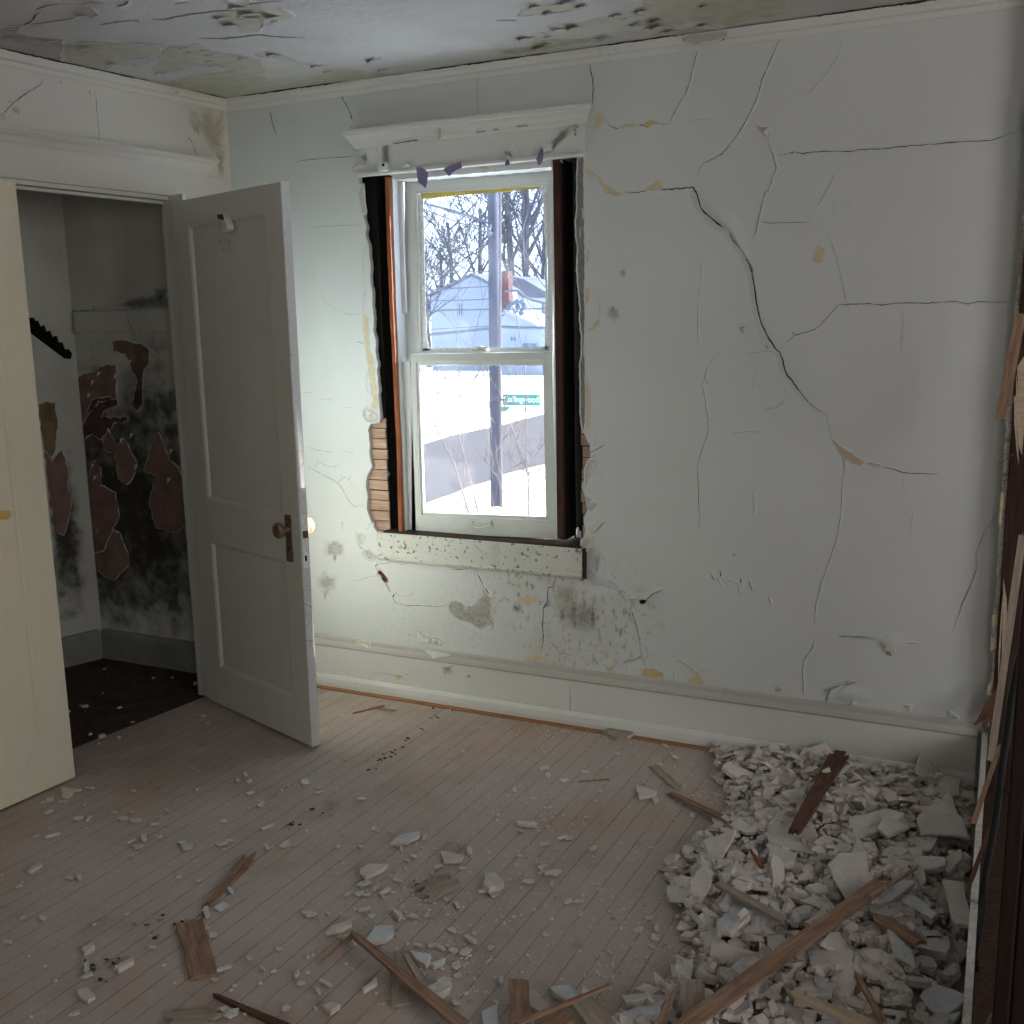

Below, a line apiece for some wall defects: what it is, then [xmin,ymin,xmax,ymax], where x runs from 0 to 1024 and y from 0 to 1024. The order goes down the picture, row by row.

peeling [0,24,391,98]
peeling [38,400,72,536]
water stain [55,505,79,586]
peeling [87,428,186,581]
water stain [82,391,191,622]
flaking render [361,313,380,424]
crack [537,577,573,662]
flaking render [574,157,623,432]
crack [697,354,753,536]
crack [590,38,1023,438]
crack [802,463,925,702]
crack [953,512,999,632]